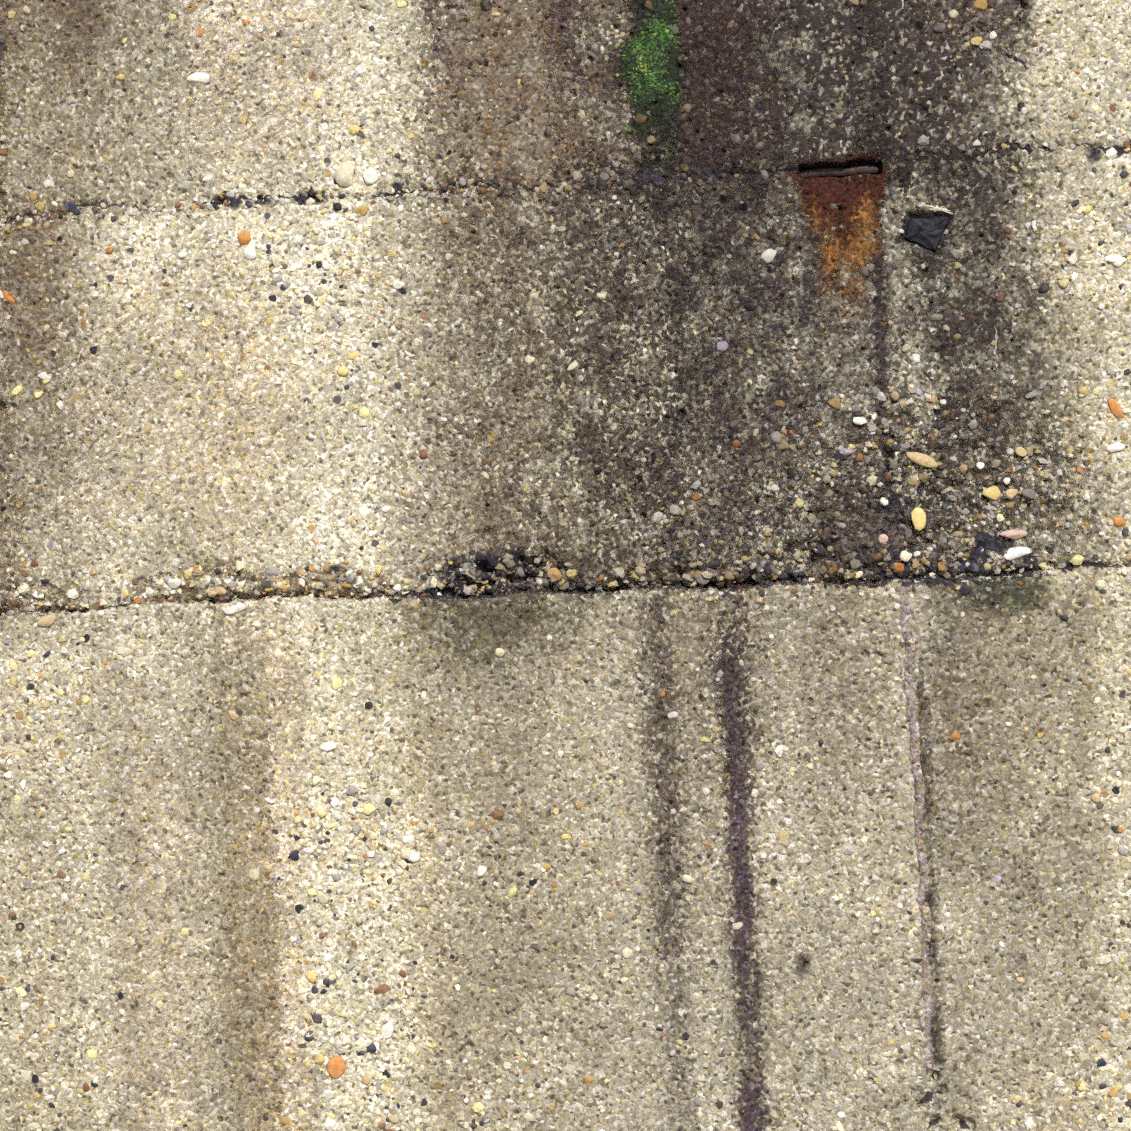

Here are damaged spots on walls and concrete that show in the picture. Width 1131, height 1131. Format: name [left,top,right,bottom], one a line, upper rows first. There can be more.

rust [793,151,885,294]
water stain [420,0,1064,1131]
crack [916,1066,970,1130]